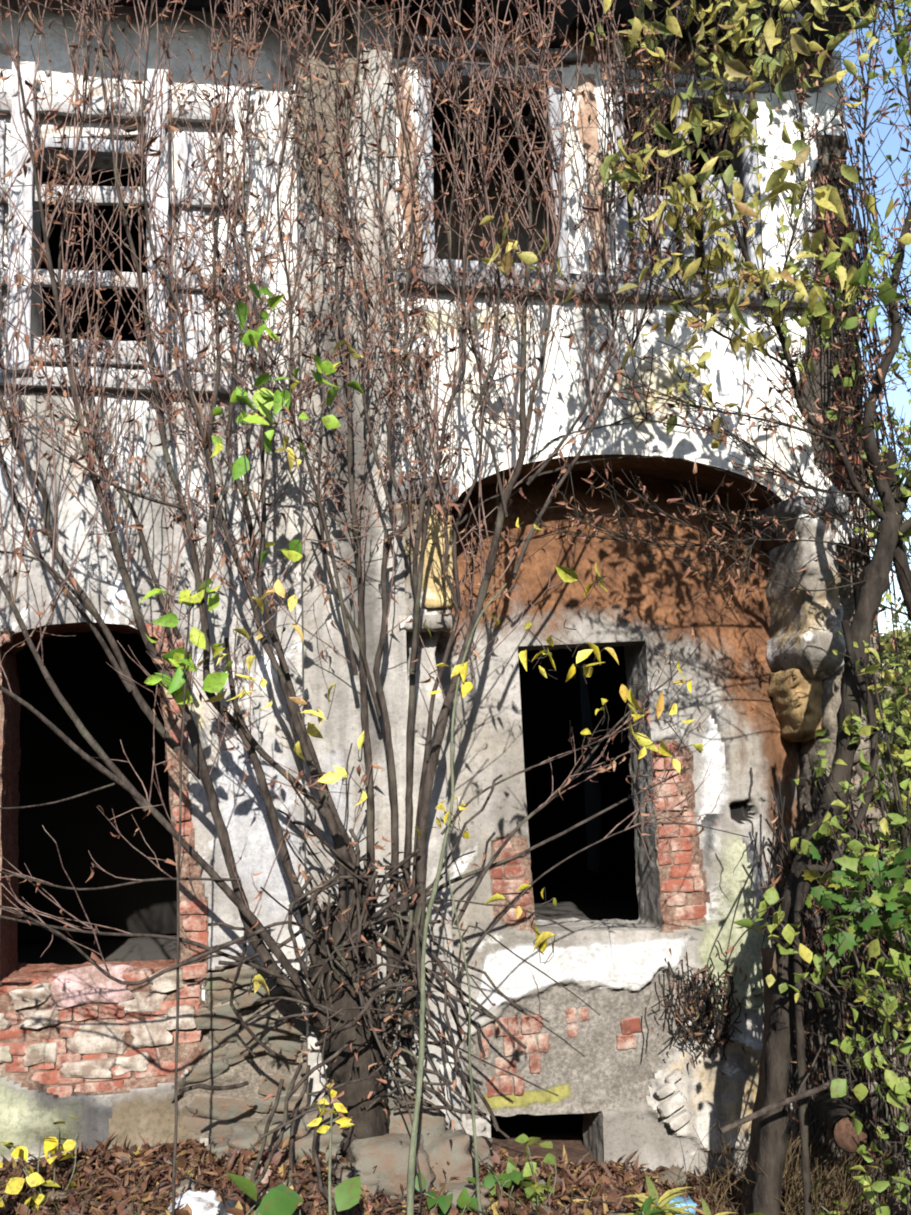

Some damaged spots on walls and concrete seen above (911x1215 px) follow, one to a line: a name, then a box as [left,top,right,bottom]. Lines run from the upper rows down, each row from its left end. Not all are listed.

spalling [0,621,307,1141]
spalling [490,833,536,933]
spalling [650,738,710,933]
spalling [463,971,693,1120]